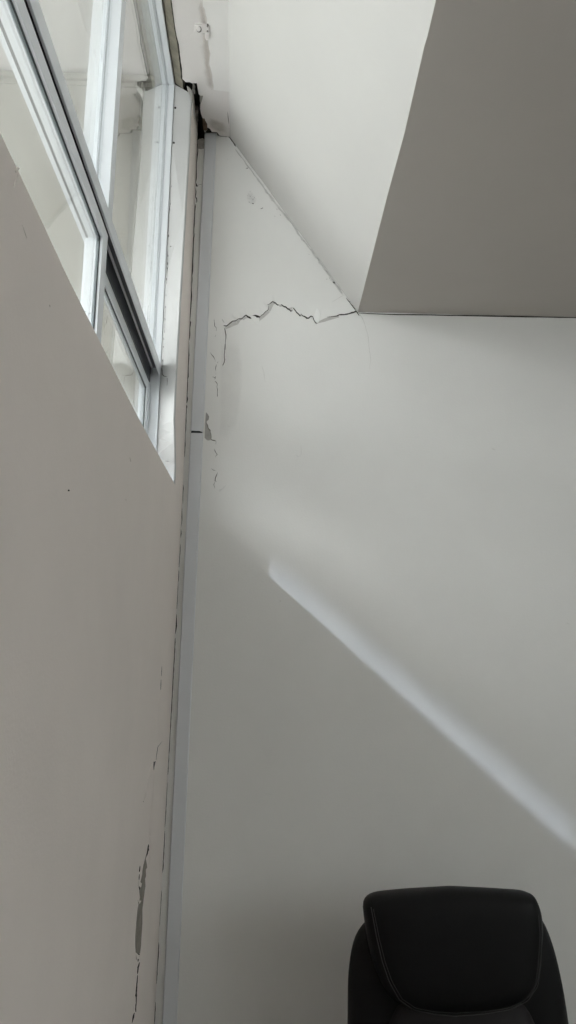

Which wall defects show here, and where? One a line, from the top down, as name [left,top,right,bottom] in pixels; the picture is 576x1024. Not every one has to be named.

crack [162,142,576,462]
peeling [205,413,215,441]
crack [153,523,182,769]
spalling [132,844,149,1022]
crack [159,796,167,914]